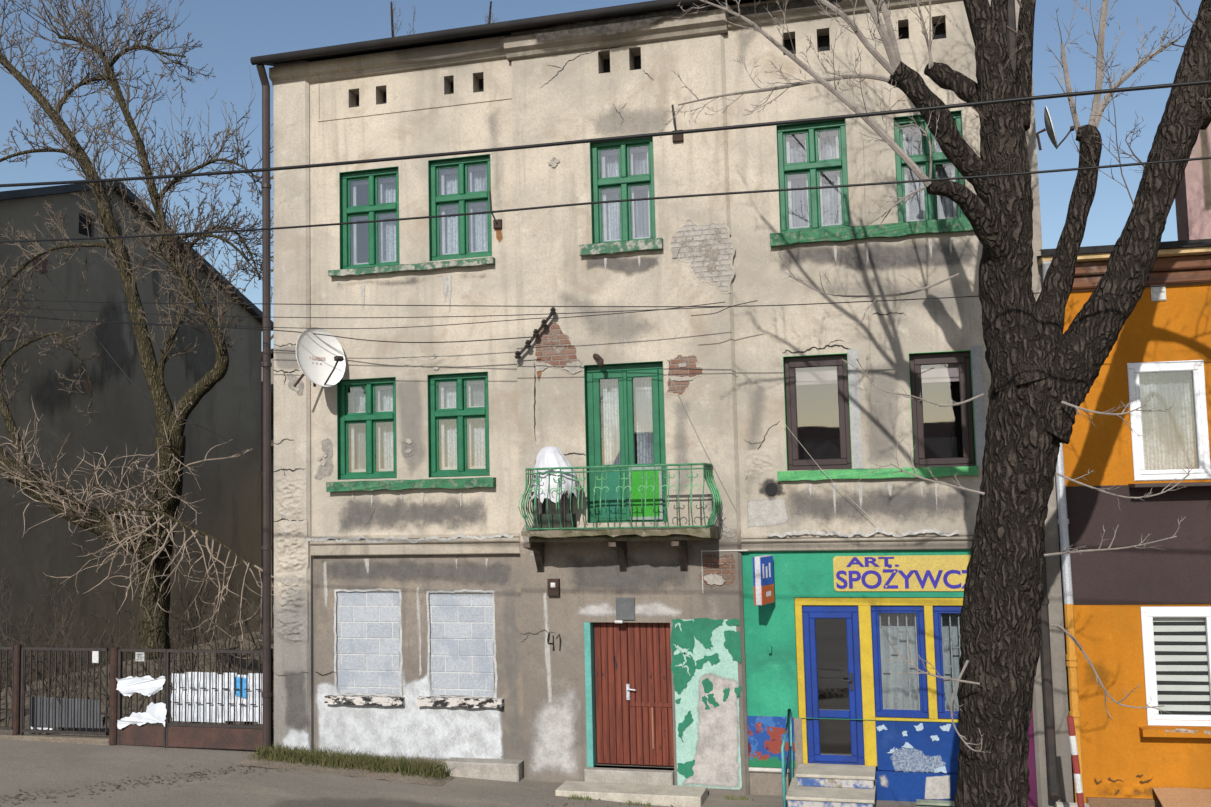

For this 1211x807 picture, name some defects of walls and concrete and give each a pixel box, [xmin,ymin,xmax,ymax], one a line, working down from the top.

spalling [668,218,735,294]
leakage [782,239,972,269]
spalling [533,320,584,374]
spalling [664,353,705,397]
spalling [697,495,738,591]
peeling [876,723,951,799]